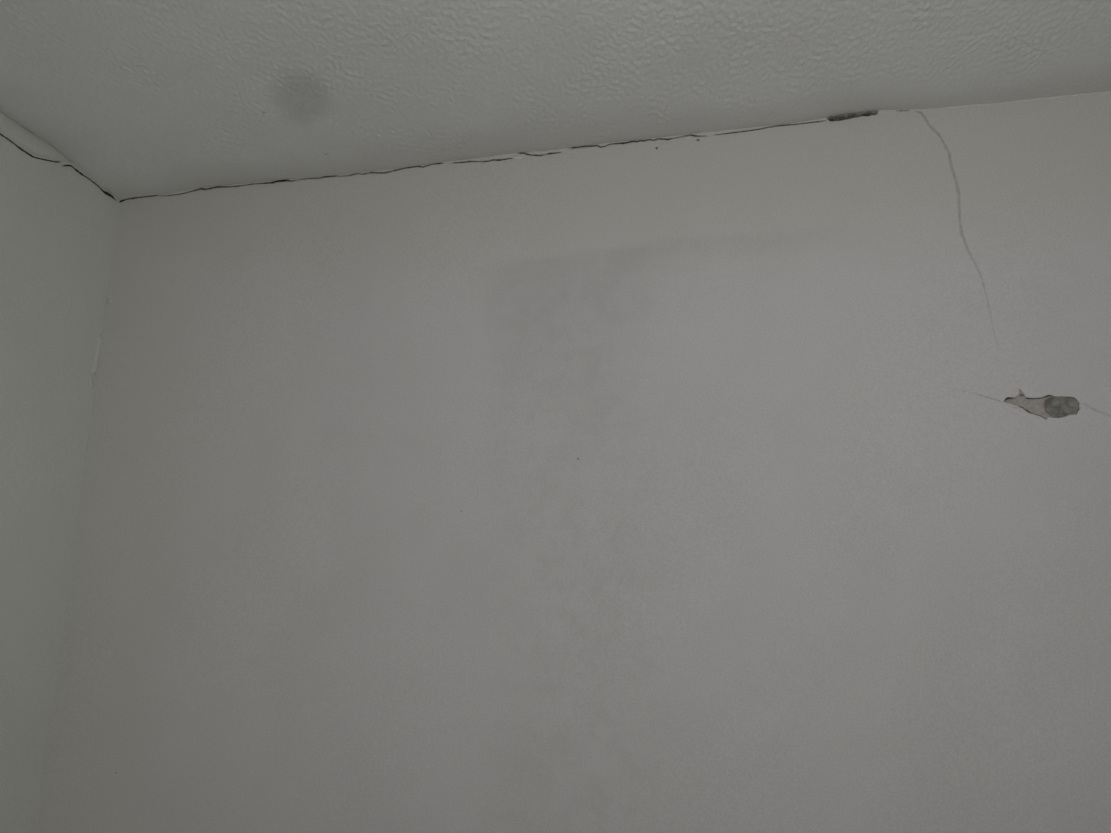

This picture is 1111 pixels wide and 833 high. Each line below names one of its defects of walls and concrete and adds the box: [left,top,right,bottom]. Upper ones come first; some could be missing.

crack [0,120,825,203]
flaking render [1003,389,1082,420]